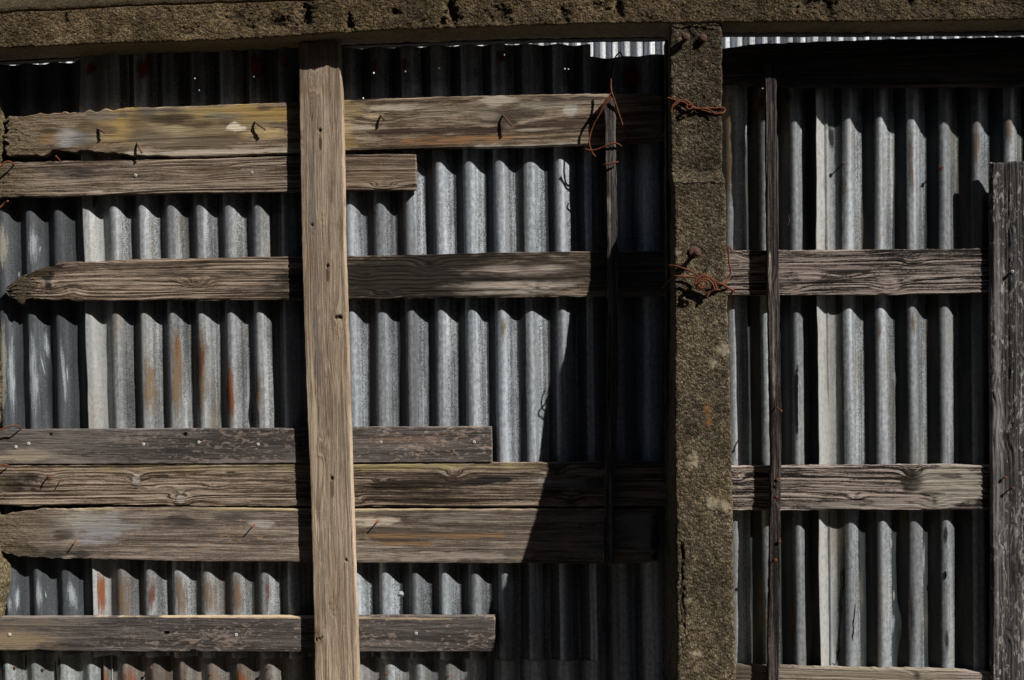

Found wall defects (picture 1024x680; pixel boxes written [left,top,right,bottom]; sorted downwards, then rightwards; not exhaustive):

rust [196,331,206,409]
rust [97,575,130,615]